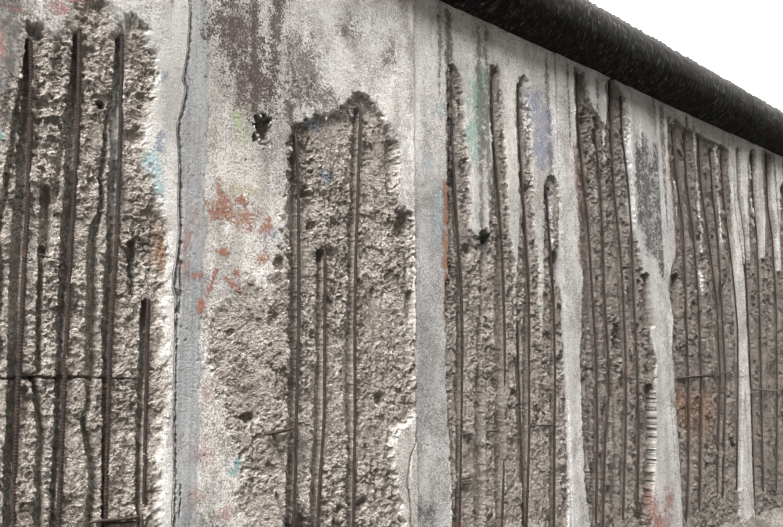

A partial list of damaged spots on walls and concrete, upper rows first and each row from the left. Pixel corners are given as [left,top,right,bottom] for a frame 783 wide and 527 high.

crack [0,373,134,381]
spalling [0,0,174,527]
crack [173,0,193,527]
spalling [197,91,416,527]
spalling [444,63,570,527]
spalling [573,64,658,527]
rust [642,483,674,527]
spalling [667,116,783,527]